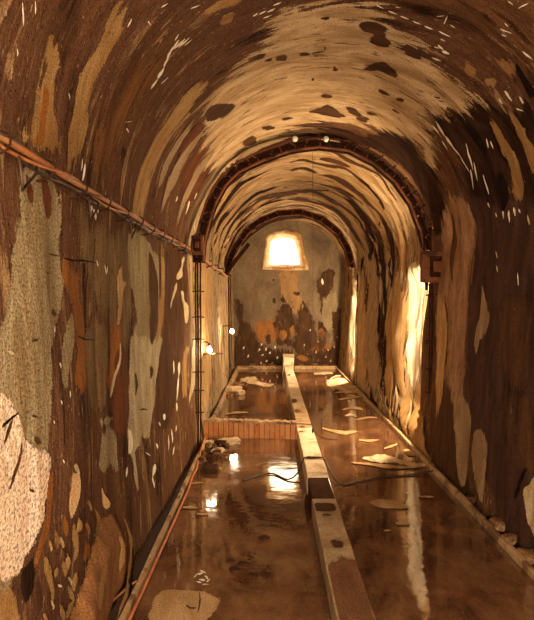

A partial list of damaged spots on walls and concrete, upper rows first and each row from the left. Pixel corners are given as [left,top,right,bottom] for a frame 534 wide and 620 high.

flaking render [0,165,64,620]
rust [61,255,87,396]
rust [252,318,295,344]
water stain [132,0,534,552]
water stain [110,517,158,611]